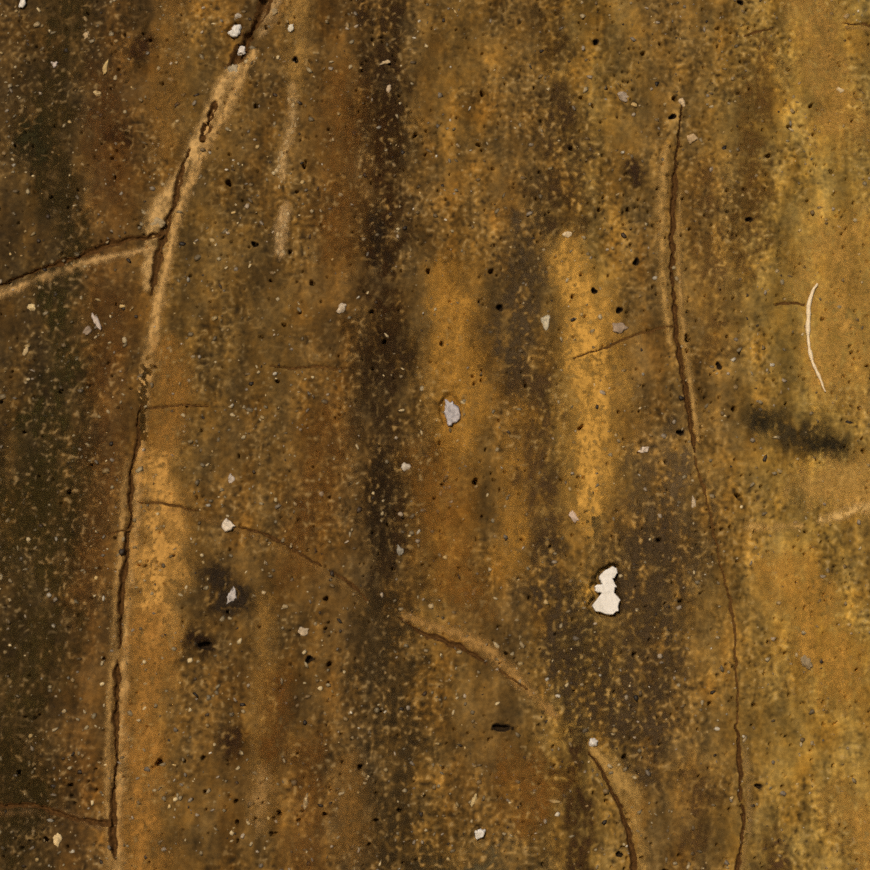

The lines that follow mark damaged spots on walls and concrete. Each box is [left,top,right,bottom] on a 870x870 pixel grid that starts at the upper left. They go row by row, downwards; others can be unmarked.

crack [844,21,870,29]
damp [802,220,870,390]
crack [0,0,281,870]
spalling [444,399,461,426]
crack [573,105,751,870]
damp [748,406,870,522]
crack [239,526,369,602]
crack [399,614,559,717]
peeling [591,566,620,615]
damp [762,558,861,699]